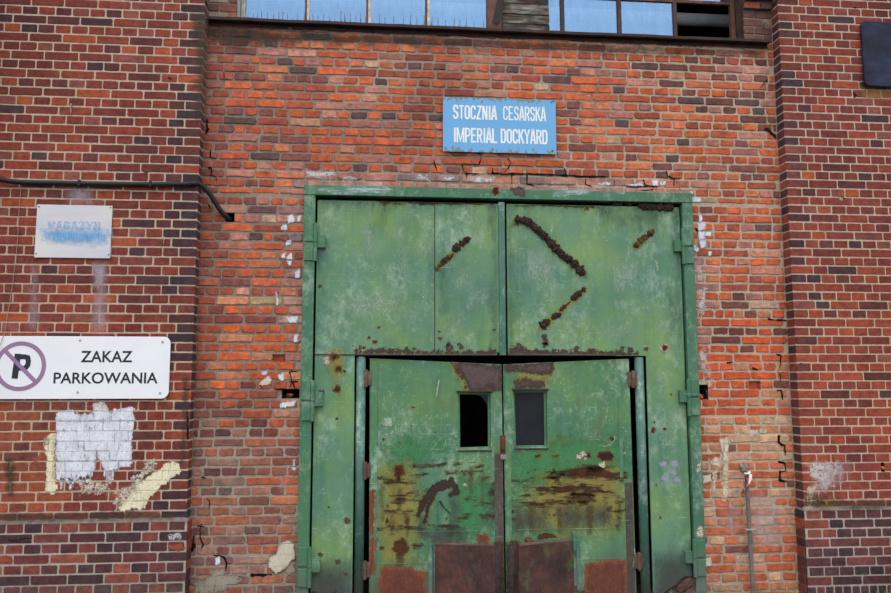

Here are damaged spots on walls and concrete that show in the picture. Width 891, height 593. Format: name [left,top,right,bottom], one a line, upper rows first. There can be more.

corrosion [378,186,601,276]
corrosion [613,202,674,212]
corrosion [633,229,655,251]
corrosion [352,287,648,393]
corrosion [319,348,346,393]
hole [699,385,708,400]
peeling [74,475,111,495]
corrosion [511,437,627,539]
leakage [806,461,887,510]
corrosion [369,462,495,593]
corrosion [477,533,520,593]
corrosion [580,559,628,593]